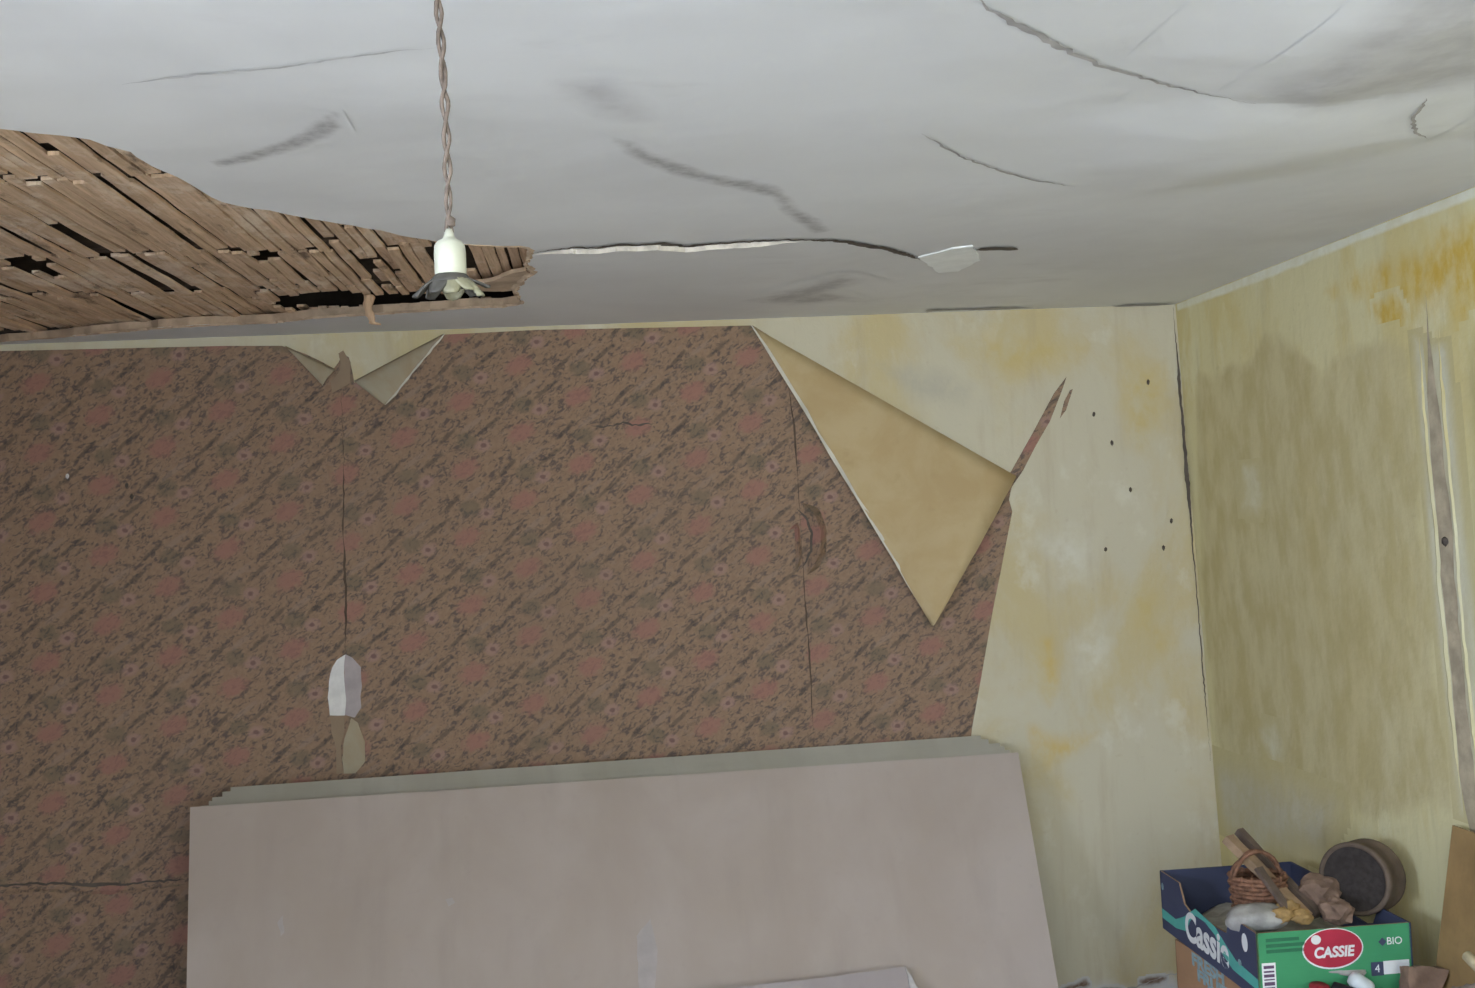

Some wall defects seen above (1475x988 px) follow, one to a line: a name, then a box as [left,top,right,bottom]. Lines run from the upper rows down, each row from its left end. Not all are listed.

crack [980,0,1256,104]
flaking render [0,129,537,342]
crack [535,239,919,259]
crack [977,245,1018,253]
water stain [1311,201,1475,338]
peeling [285,346,335,386]
peeling [354,334,444,405]
peeling [751,325,1016,626]